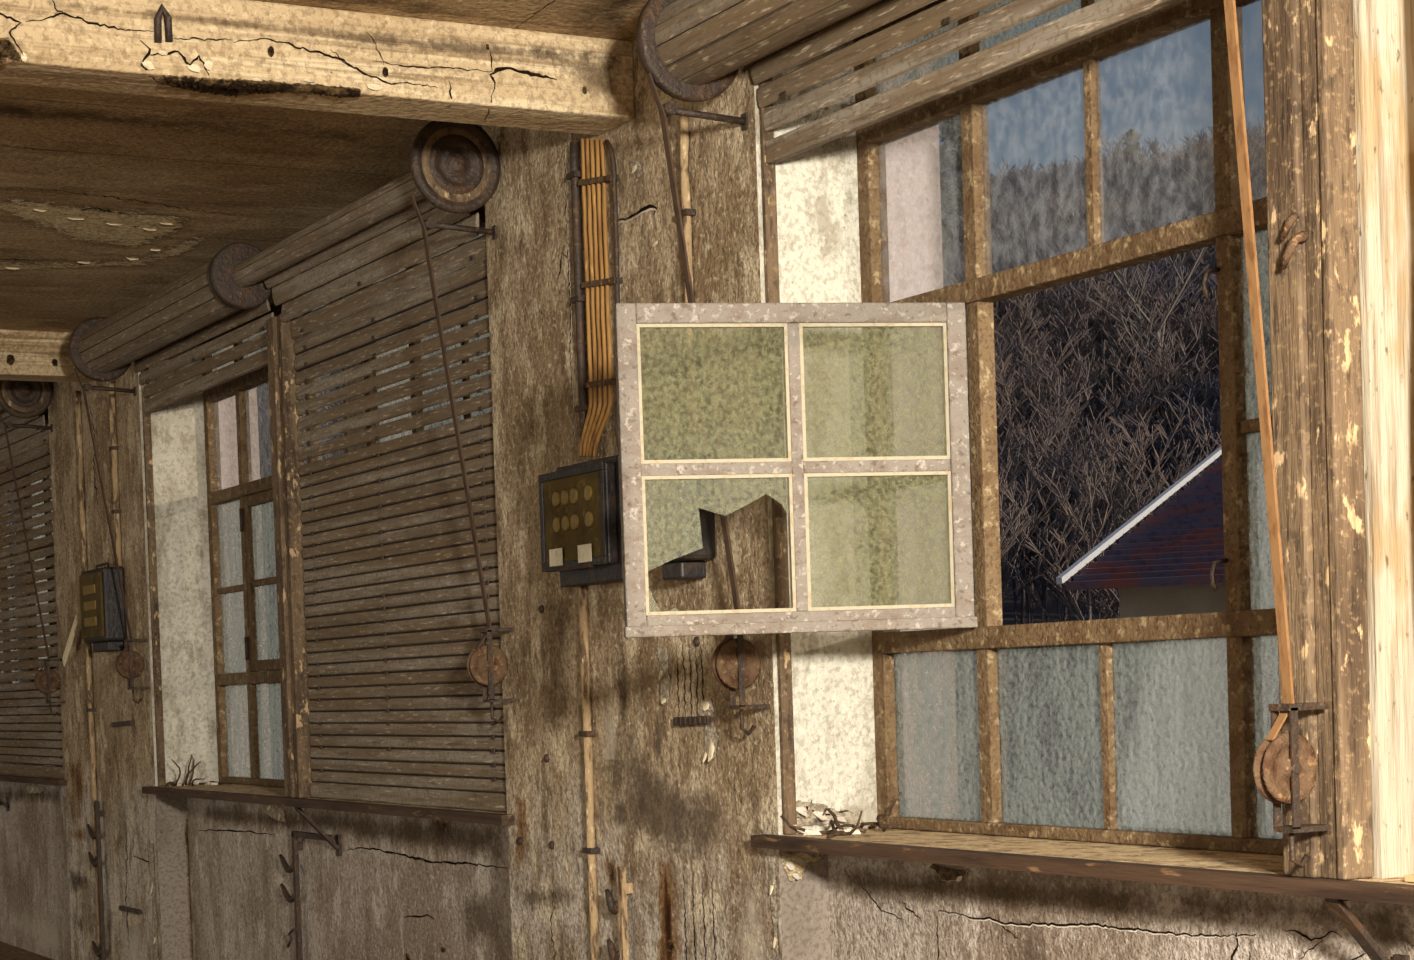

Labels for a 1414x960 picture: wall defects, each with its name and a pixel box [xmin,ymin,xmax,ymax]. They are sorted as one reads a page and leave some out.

spalling [0,12,27,65]
spalling [140,40,383,98]
crack [25,0,557,122]
crack [198,828,274,836]
crack [348,847,508,868]
rust [659,863,678,960]
crack [859,877,1366,960]